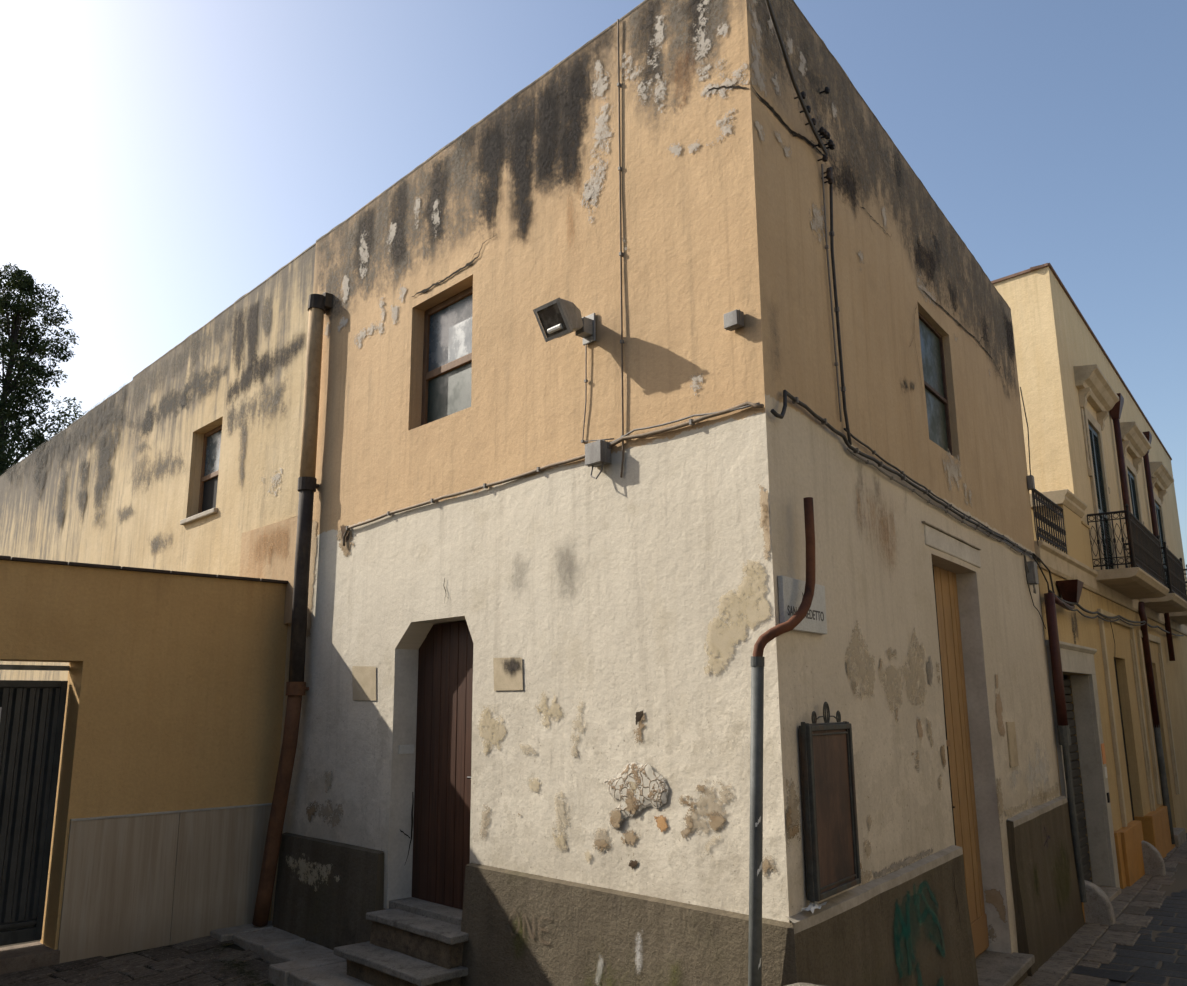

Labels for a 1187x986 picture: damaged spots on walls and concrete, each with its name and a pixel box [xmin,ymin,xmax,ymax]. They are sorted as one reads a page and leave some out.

water stain [318,29,613,313]
peeling [581,15,667,223]
water stain [756,0,1015,388]
water stain [7,299,304,527]
water stain [151,537,172,552]
peeling [704,484,772,677]
flaking render [285,853,339,892]
flaking render [585,762,734,862]